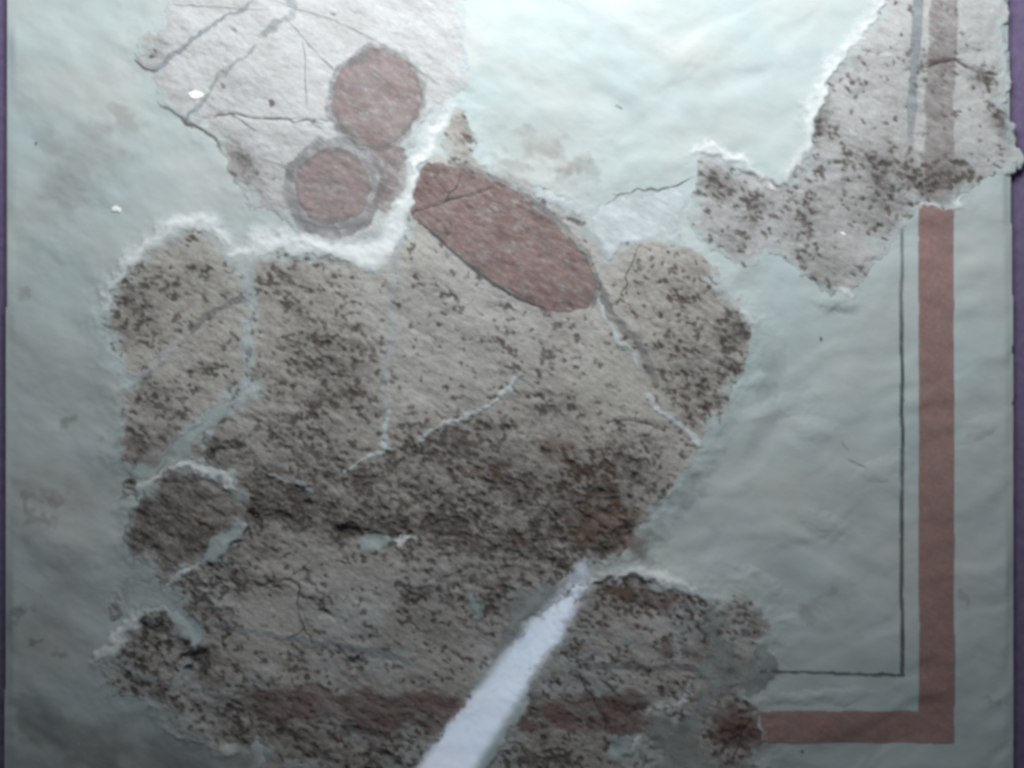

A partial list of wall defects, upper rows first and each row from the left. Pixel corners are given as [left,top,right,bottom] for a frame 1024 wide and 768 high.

peeling [189,90,204,99]
crack [160,105,328,141]
spalling [693,168,831,289]
spalling [812,121,982,240]
spalling [107,267,240,430]
spalling [607,252,750,458]
spalling [203,435,246,464]
spalling [221,253,673,646]
spalling [179,562,248,630]
spalling [111,612,440,768]
spalling [502,578,759,768]